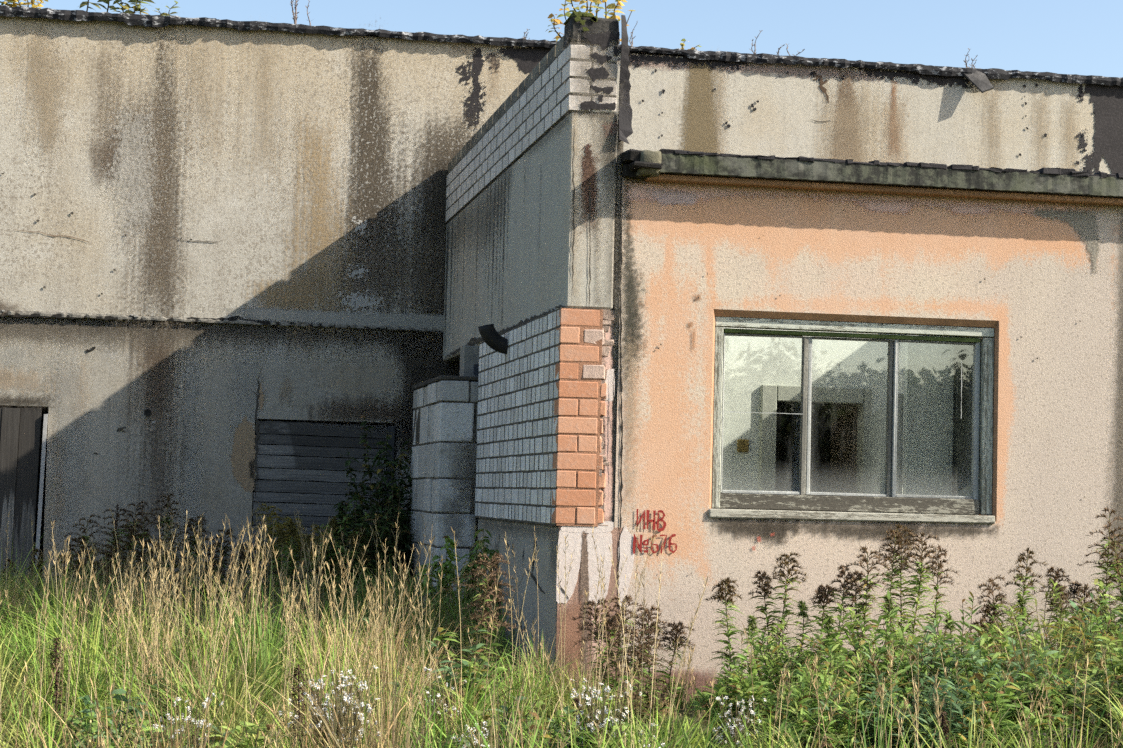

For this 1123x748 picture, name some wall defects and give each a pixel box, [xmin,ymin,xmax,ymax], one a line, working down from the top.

peeling [455,46,552,130]
leakage [681,62,720,153]
leakage [832,72,862,162]
peeling [1076,84,1123,174]
leakage [0,27,510,529]
rust [581,143,598,226]
leakage [601,122,645,379]
peeling [624,182,1109,272]
crack [0,129,623,583]
leakage [1113,292,1123,562]
leakage [557,532,589,674]